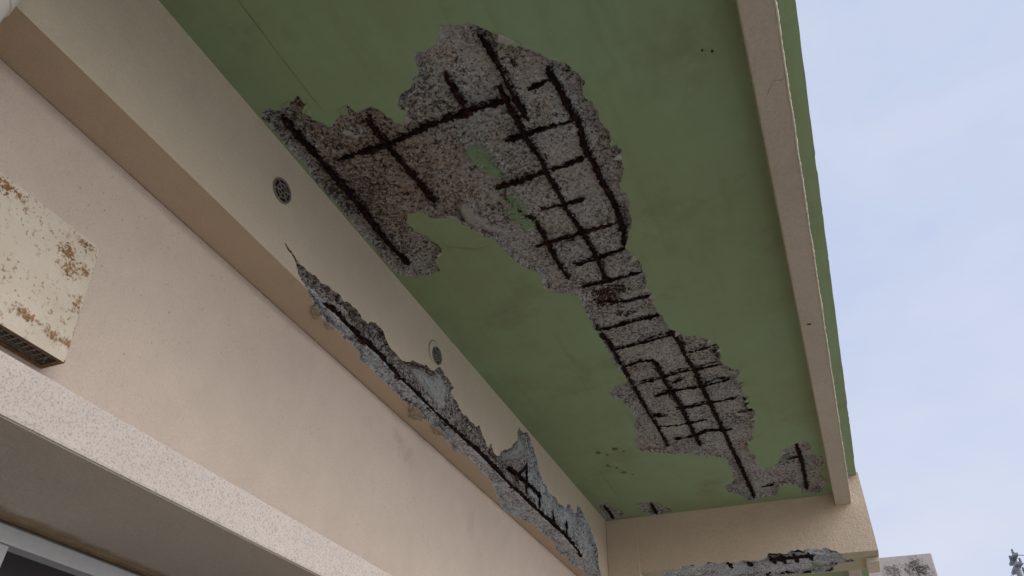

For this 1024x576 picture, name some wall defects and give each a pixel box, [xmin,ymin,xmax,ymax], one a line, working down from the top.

rust [0,178,33,205]
rust [58,235,95,280]
spalling [262,23,826,500]
rust [5,301,71,347]
spalling [285,243,601,576]
spalling [596,503,625,520]
spalling [637,502,671,515]
spalling [663,548,856,576]